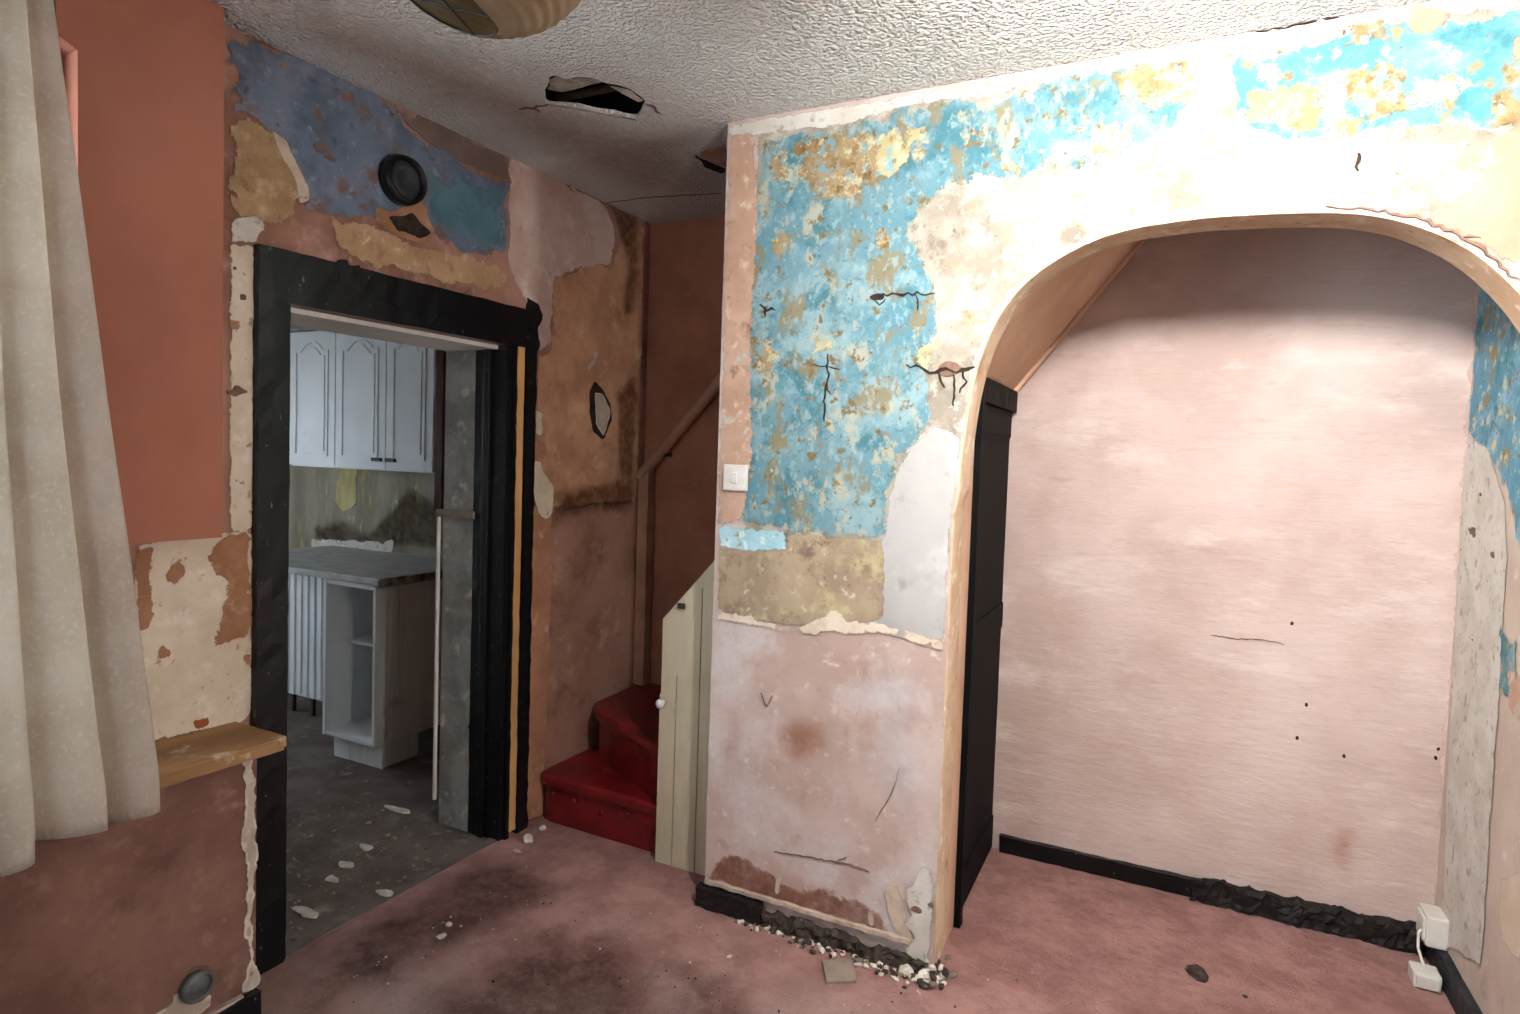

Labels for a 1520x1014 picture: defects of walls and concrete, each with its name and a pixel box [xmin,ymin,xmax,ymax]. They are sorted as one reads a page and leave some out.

spalling [545,76,645,114]
peeling [226,35,510,290]
crack [870,291,935,310]
peeling [695,0,1520,552]
crack [906,361,974,406]
peeling [134,216,265,740]
spalling [717,610,943,650]
peeling [1433,285,1520,964]
spalling [240,760,261,993]
water stain [715,856,914,947]
spalling [905,867,934,963]